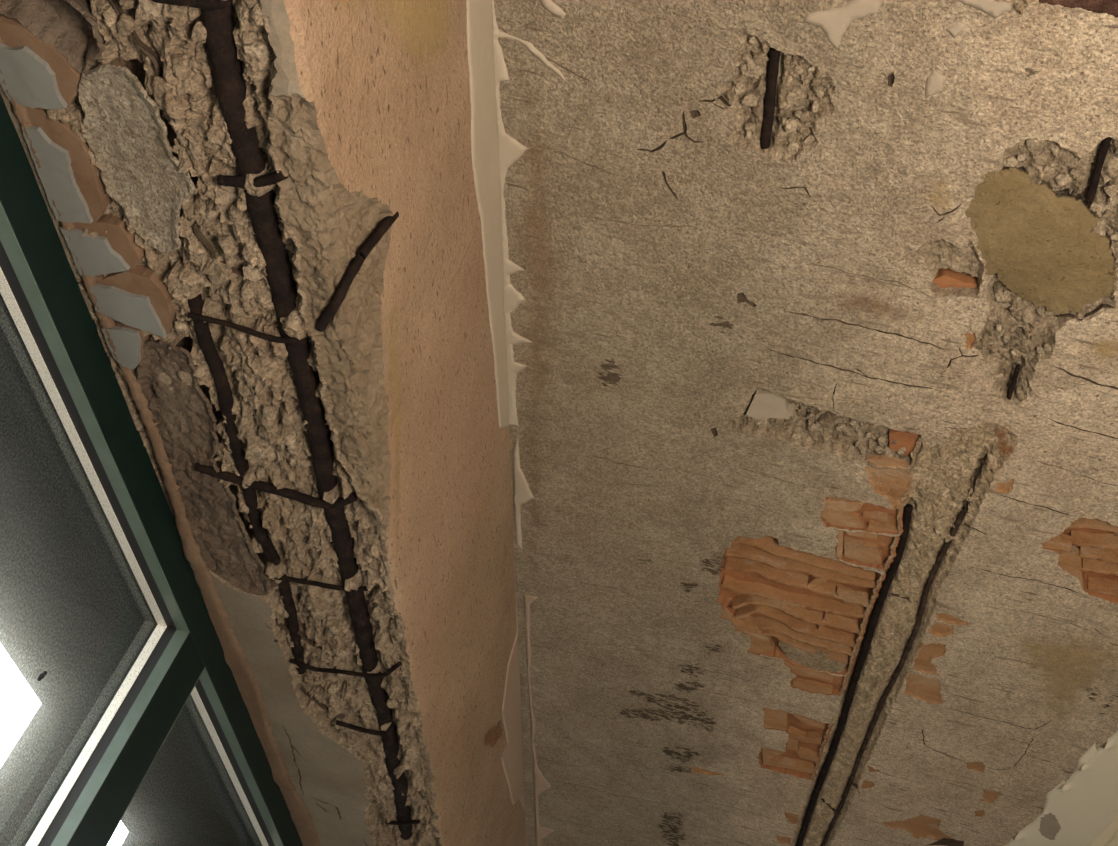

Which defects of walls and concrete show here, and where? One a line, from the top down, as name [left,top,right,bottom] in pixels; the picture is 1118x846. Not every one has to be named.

spalling [715,28,835,163]
peeling [466,0,567,550]
spalling [887,137,1118,405]
spalling [0,0,443,846]
crack [769,311,978,408]
crack [963,449,1076,535]
crack [1034,460,1118,486]
crack [1045,417,1118,439]
crack [1051,365,1118,390]
spalling [716,389,1018,846]
spalling [1041,518,1118,604]
peeling [1004,724,1118,846]